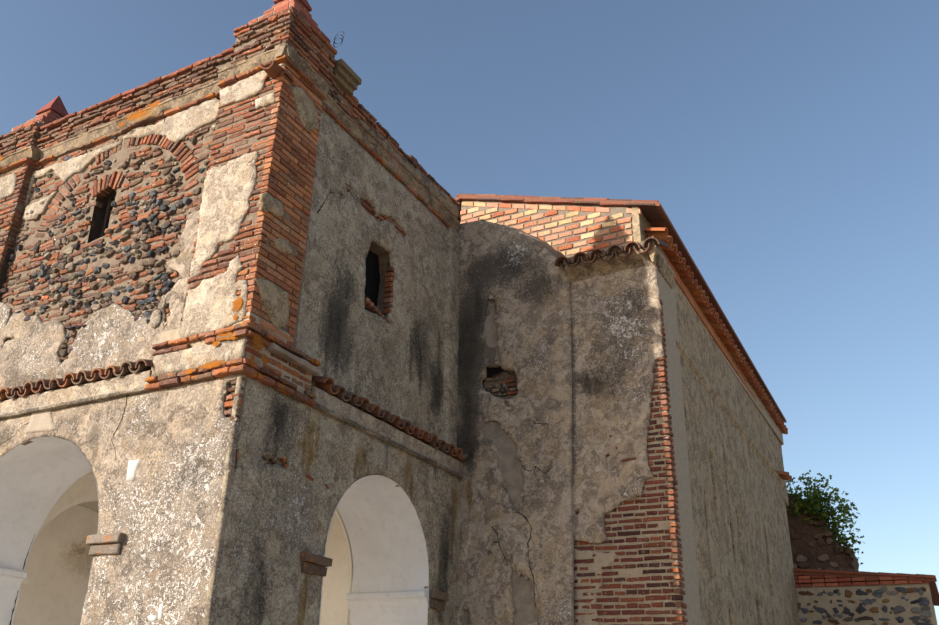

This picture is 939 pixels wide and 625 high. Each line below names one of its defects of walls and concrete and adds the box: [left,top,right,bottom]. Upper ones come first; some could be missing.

peeling [290,86,319,131]
spalling [0,70,290,389]
spalling [480,335,518,434]
spalling [574,298,688,625]
crack [492,465,562,608]